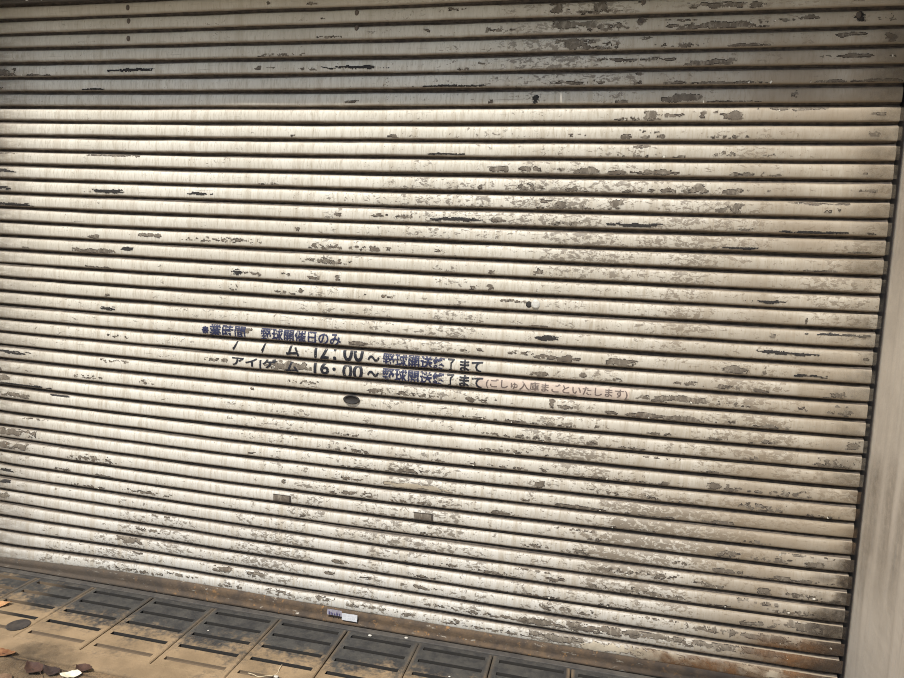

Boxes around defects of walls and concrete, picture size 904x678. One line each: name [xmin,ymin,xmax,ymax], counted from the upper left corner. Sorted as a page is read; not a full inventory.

peeling [515,183,594,210]
peeling [72,234,115,254]
peeling [300,242,391,265]
peeling [508,350,581,363]
peeling [264,360,319,385]
peeling [462,415,572,441]
peeling [605,411,704,423]
peeling [54,454,117,490]
peeling [325,465,423,498]
peeling [698,470,812,513]
peeling [555,503,606,512]
peeling [424,540,840,678]